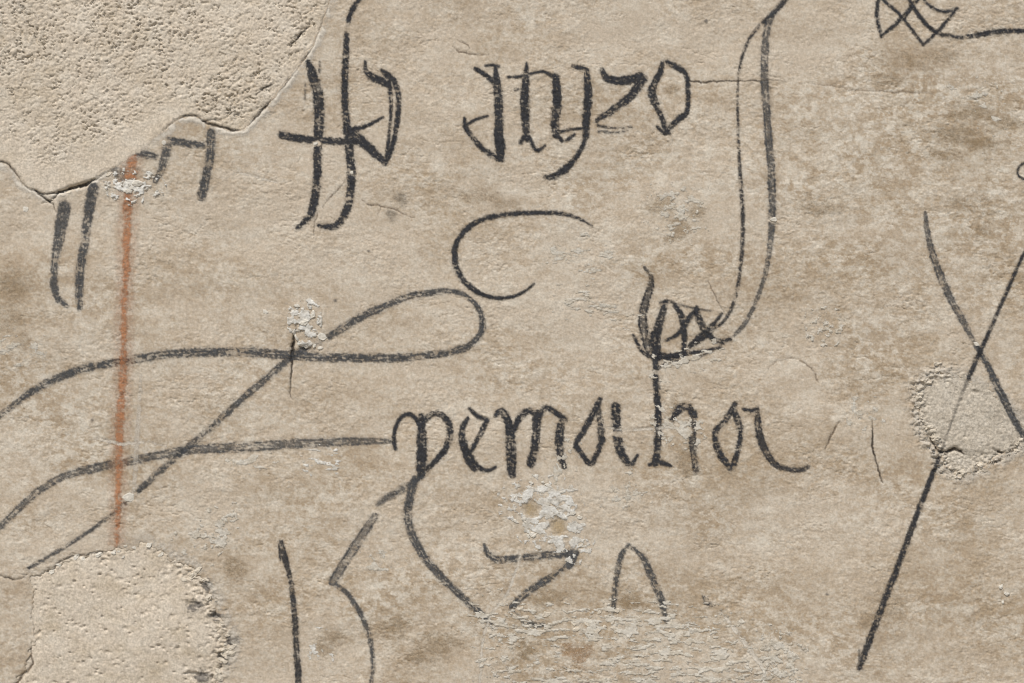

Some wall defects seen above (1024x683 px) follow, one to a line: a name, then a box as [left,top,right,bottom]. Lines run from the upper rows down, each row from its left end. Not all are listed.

spalling [0,0,337,204]
crack [2,162,98,203]
rust [124,155,137,180]
rust [114,193,133,544]
peeling [287,298,327,350]
spalling [912,362,1024,482]
peeling [497,438,595,565]
spalling [17,502,247,683]